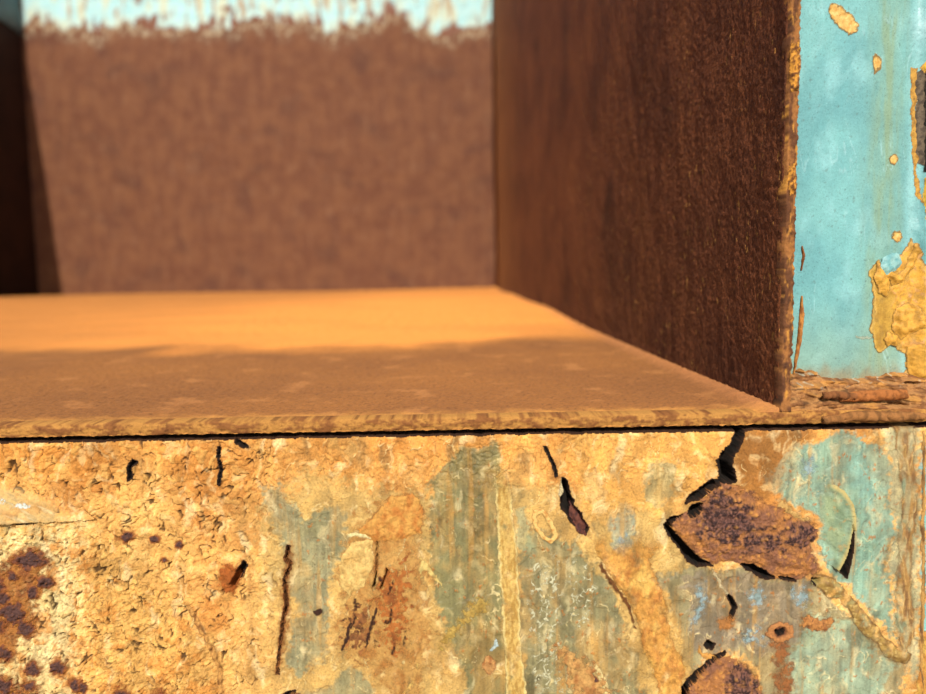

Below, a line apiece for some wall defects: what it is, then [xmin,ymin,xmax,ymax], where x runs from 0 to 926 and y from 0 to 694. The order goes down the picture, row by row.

peeling [829,3,859,35]
rust [789,40,801,92]
rust [787,163,797,196]
peeling [869,231,926,378]
peeling [0,482,95,525]
rust [118,530,136,544]
crack [0,421,926,630]
rust [0,547,57,663]
crack [275,545,292,675]
rust [0,659,88,694]